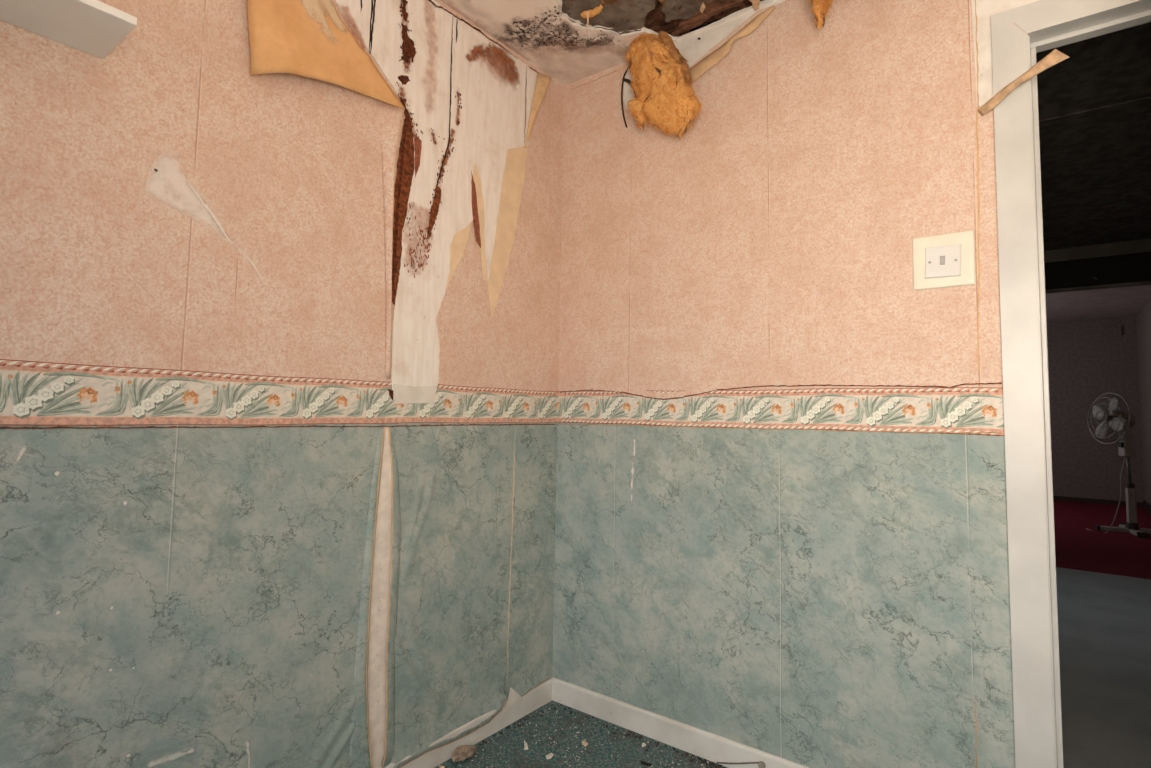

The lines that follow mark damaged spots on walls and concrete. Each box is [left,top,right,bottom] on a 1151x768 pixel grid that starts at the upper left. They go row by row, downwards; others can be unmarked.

leakage [466,6,619,80]
flaking render [674,0,785,83]
flaking render [623,66,635,111]
peeling [247,0,552,404]
flaking render [971,0,1070,375]